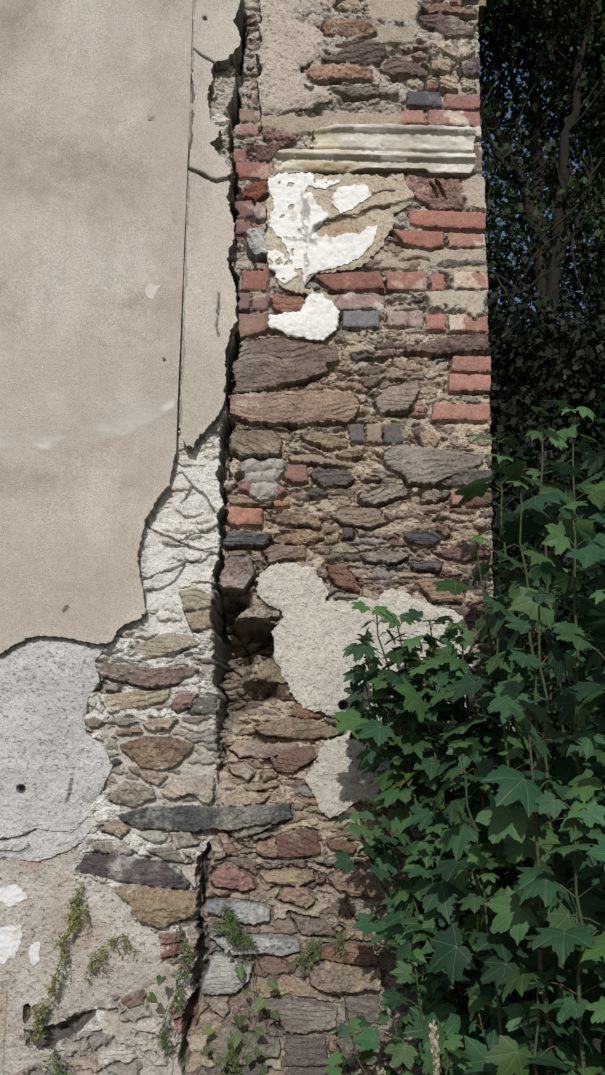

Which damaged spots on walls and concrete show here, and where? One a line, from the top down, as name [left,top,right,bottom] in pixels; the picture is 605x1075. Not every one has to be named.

crack [179,0,246,425]
crack [143,270,240,599]
crack [0,829,38,854]
spalling [0,143,298,1075]
crack [174,843,215,1075]
crack [216,740,227,785]